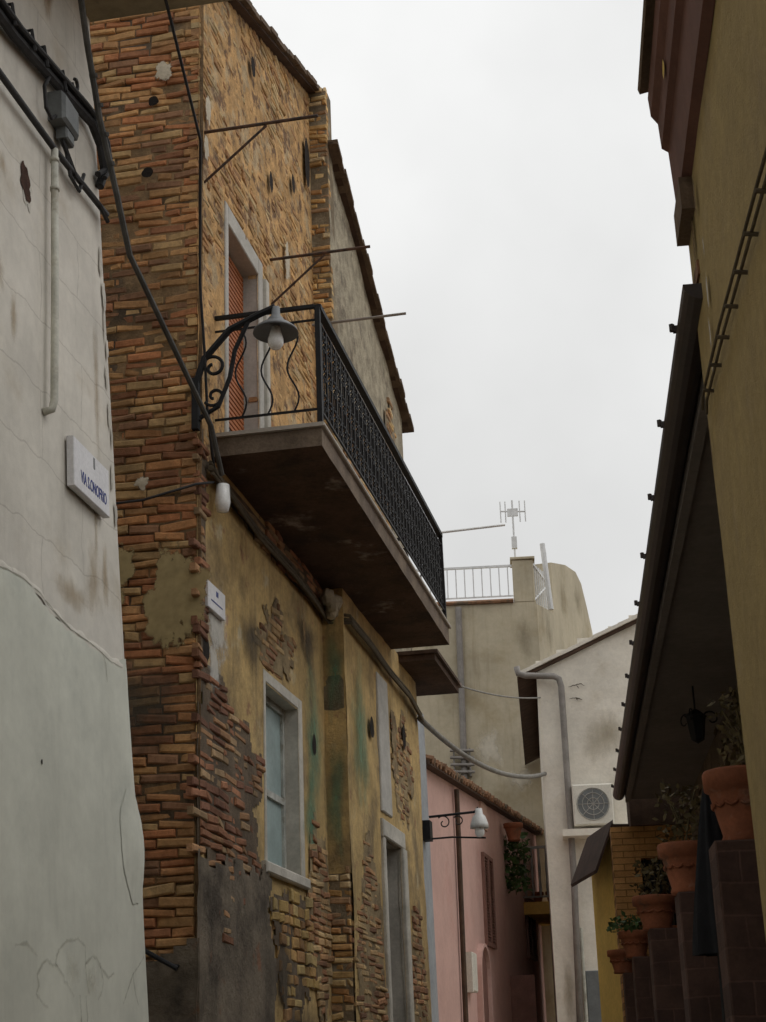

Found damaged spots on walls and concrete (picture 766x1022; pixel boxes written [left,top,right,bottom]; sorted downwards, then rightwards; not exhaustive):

flaking render [188,429,343,620]
flaking render [186,585,266,880]
flaking render [253,598,297,681]
flaking render [390,709,415,832]
flaking render [269,812,335,1022]
flaking render [349,830,389,1022]